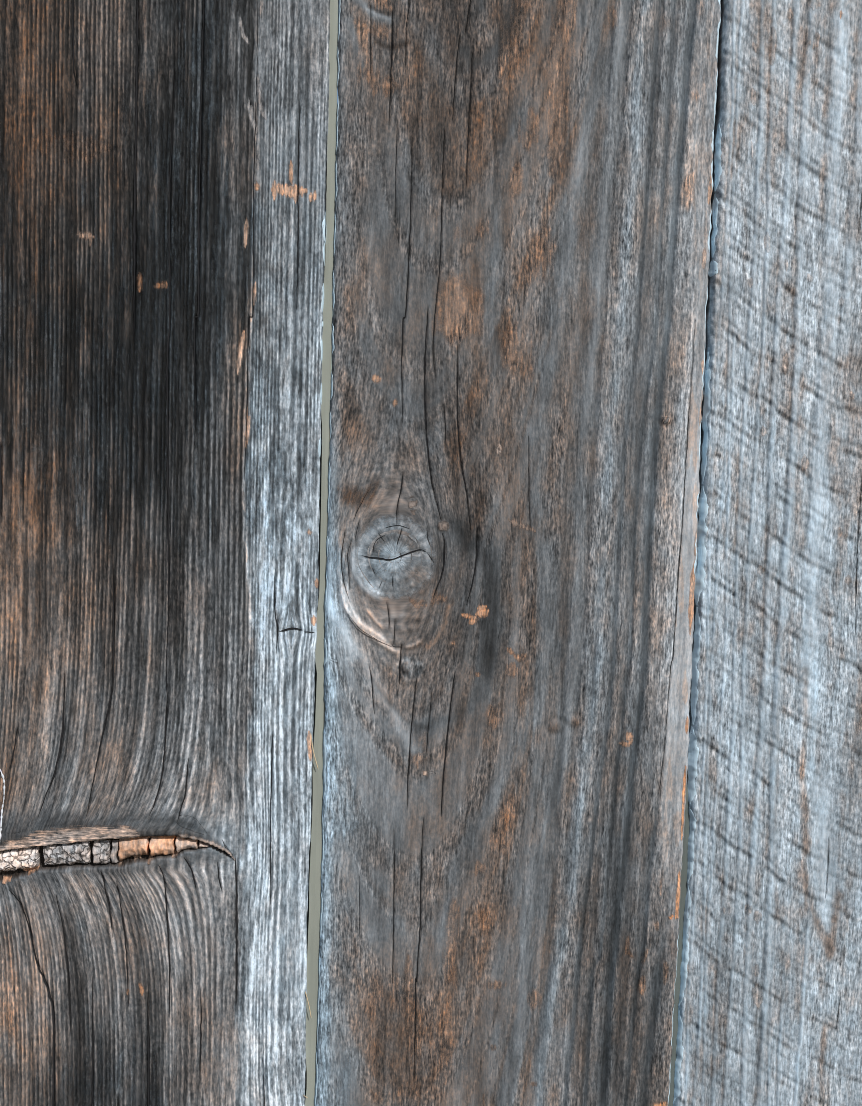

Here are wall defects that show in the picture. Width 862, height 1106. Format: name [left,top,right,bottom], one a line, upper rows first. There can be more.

crack [9,889,93,1106]